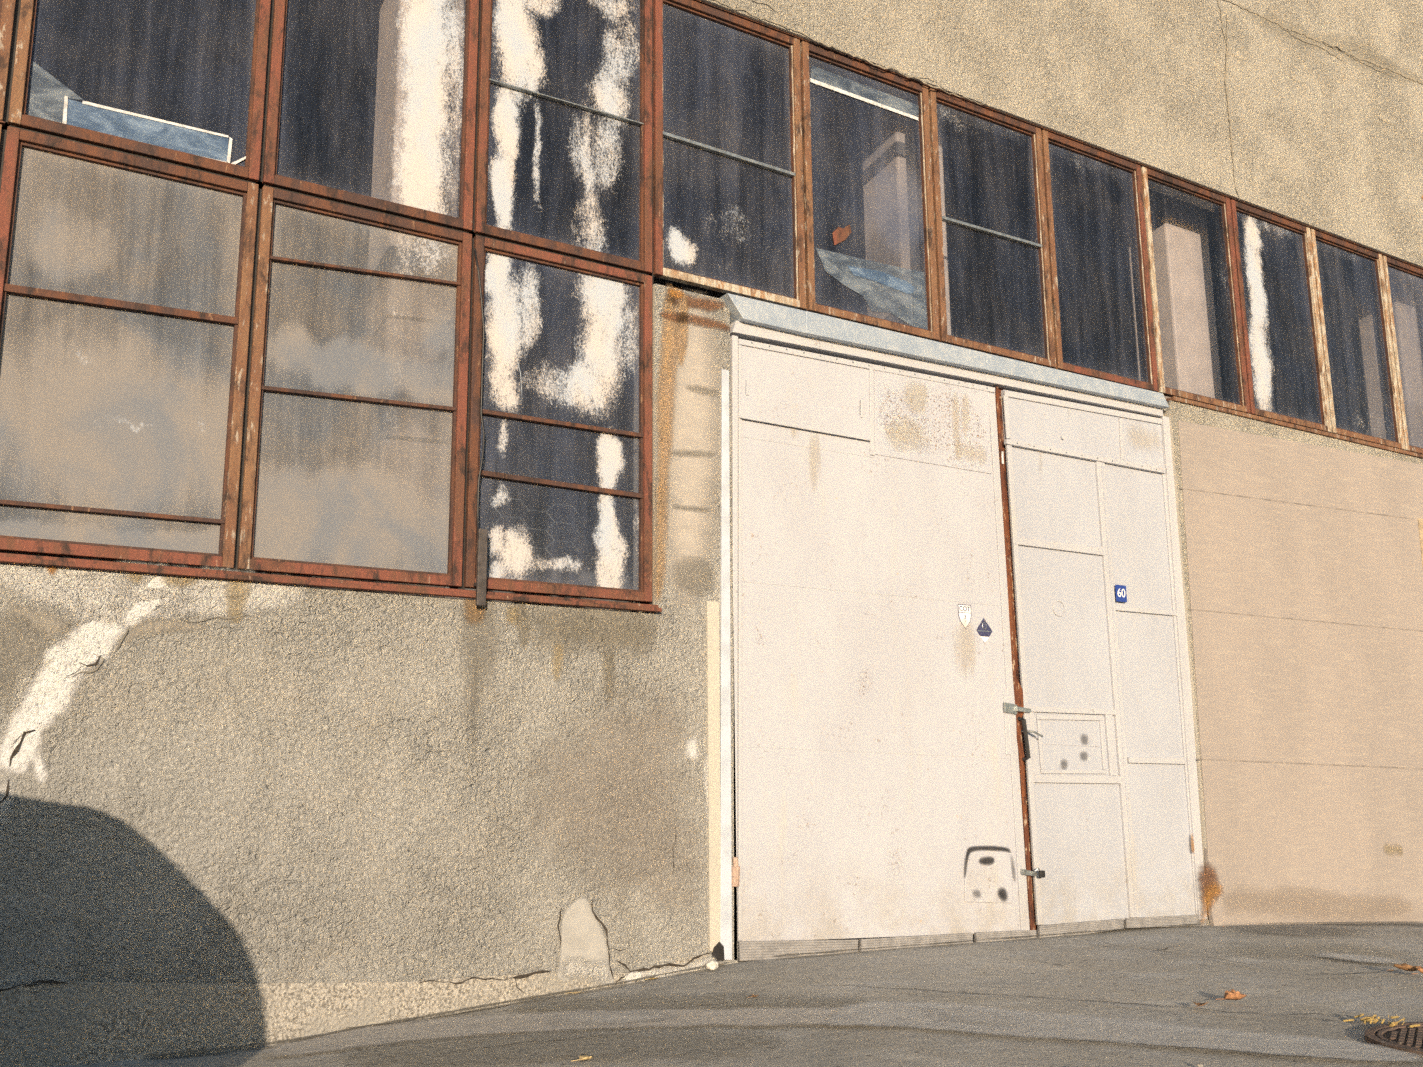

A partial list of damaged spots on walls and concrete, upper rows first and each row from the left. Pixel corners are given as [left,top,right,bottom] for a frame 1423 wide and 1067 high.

crack [1218,0,1423,200]
corrosion [656,288,729,597]
flaking render [0,563,309,828]
crack [325,898,709,1032]
corrosion [1200,867,1221,917]